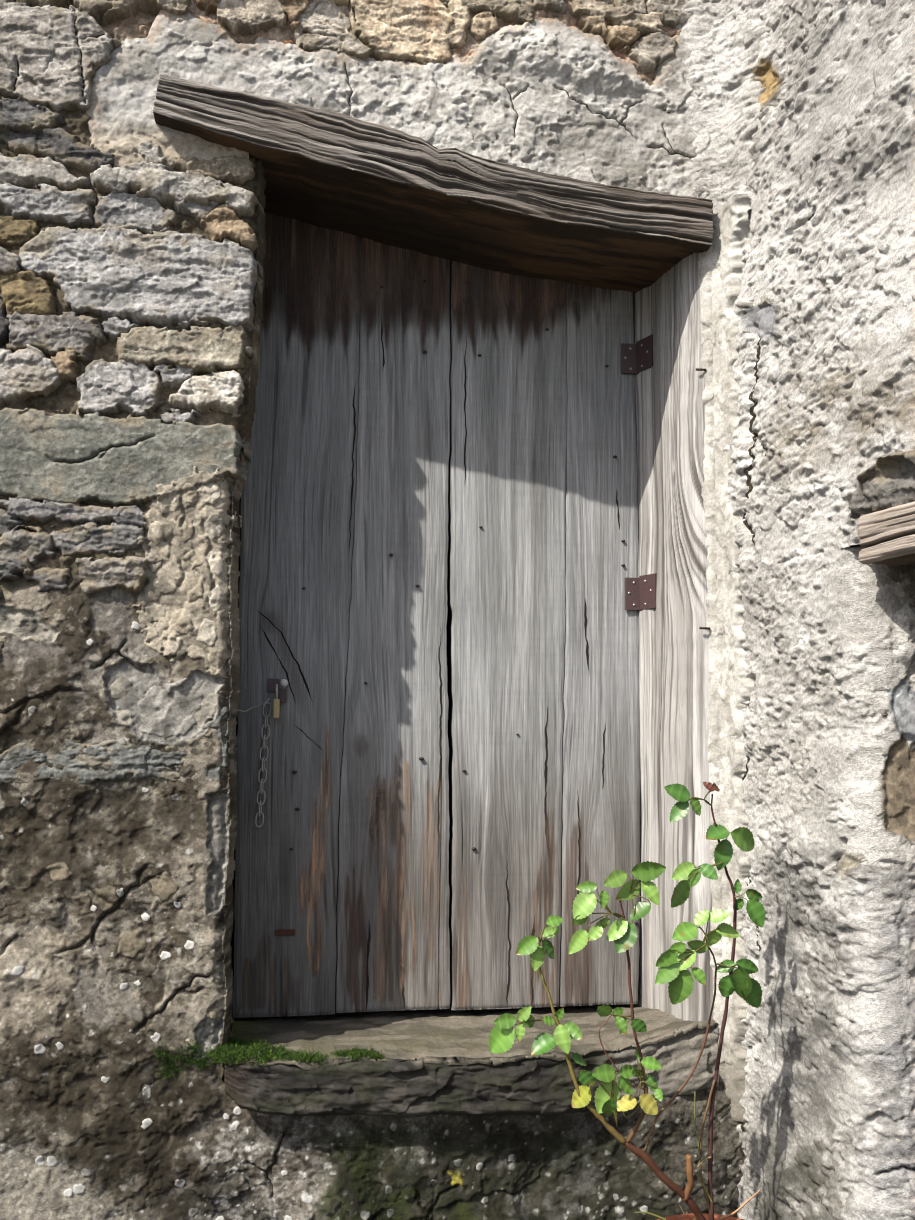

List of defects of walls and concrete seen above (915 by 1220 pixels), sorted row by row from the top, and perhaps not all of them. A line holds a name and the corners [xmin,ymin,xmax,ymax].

crack [505,86,691,159]
spalling [874,673,915,841]
crack [60,868,162,952]
crack [138,972,215,1029]
water stain [4,1038,214,1214]